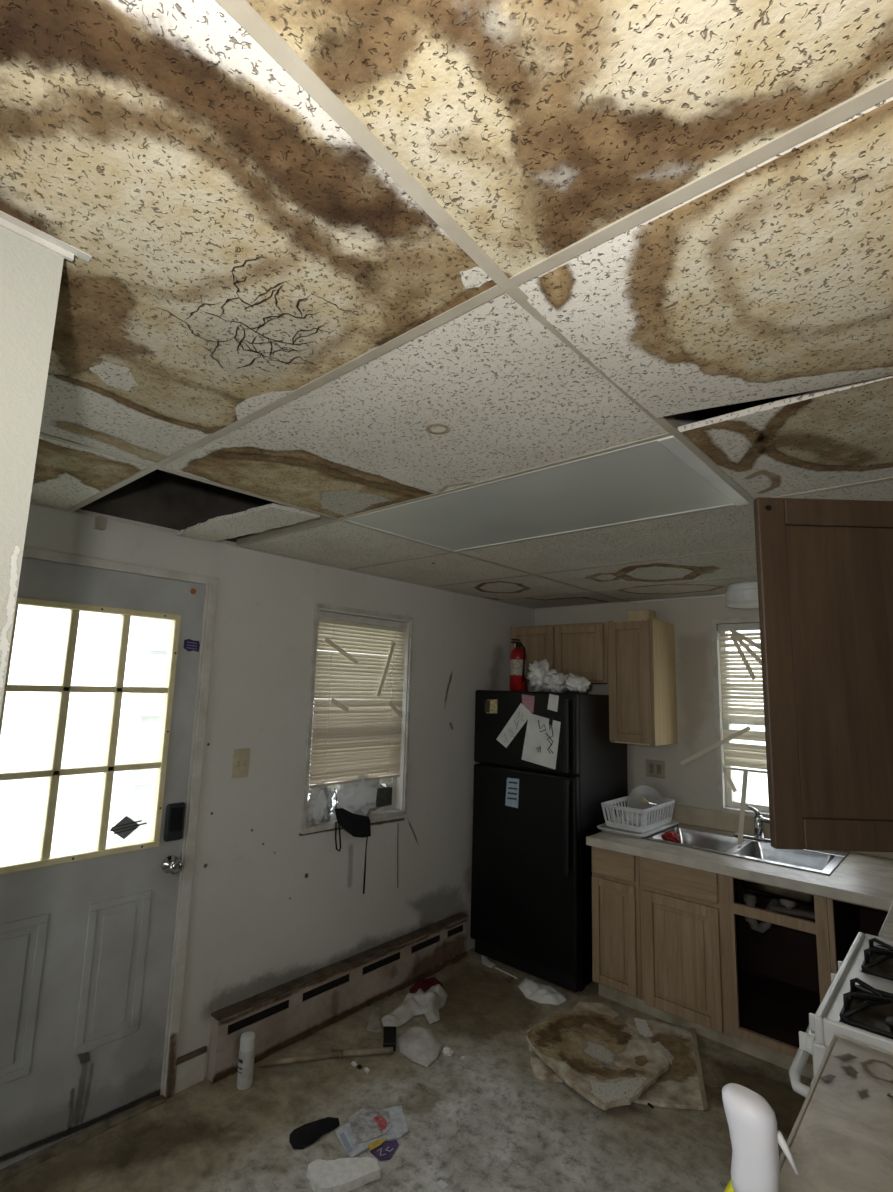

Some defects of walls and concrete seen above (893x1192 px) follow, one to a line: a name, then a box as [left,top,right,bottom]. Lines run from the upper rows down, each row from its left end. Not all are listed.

damp [246,0,893,256]
damp [0,0,511,434]
crack [156,257,362,369]
damp [539,264,574,309]
damp [626,100,893,493]
damp [182,447,472,518]
damp [586,563,725,594]